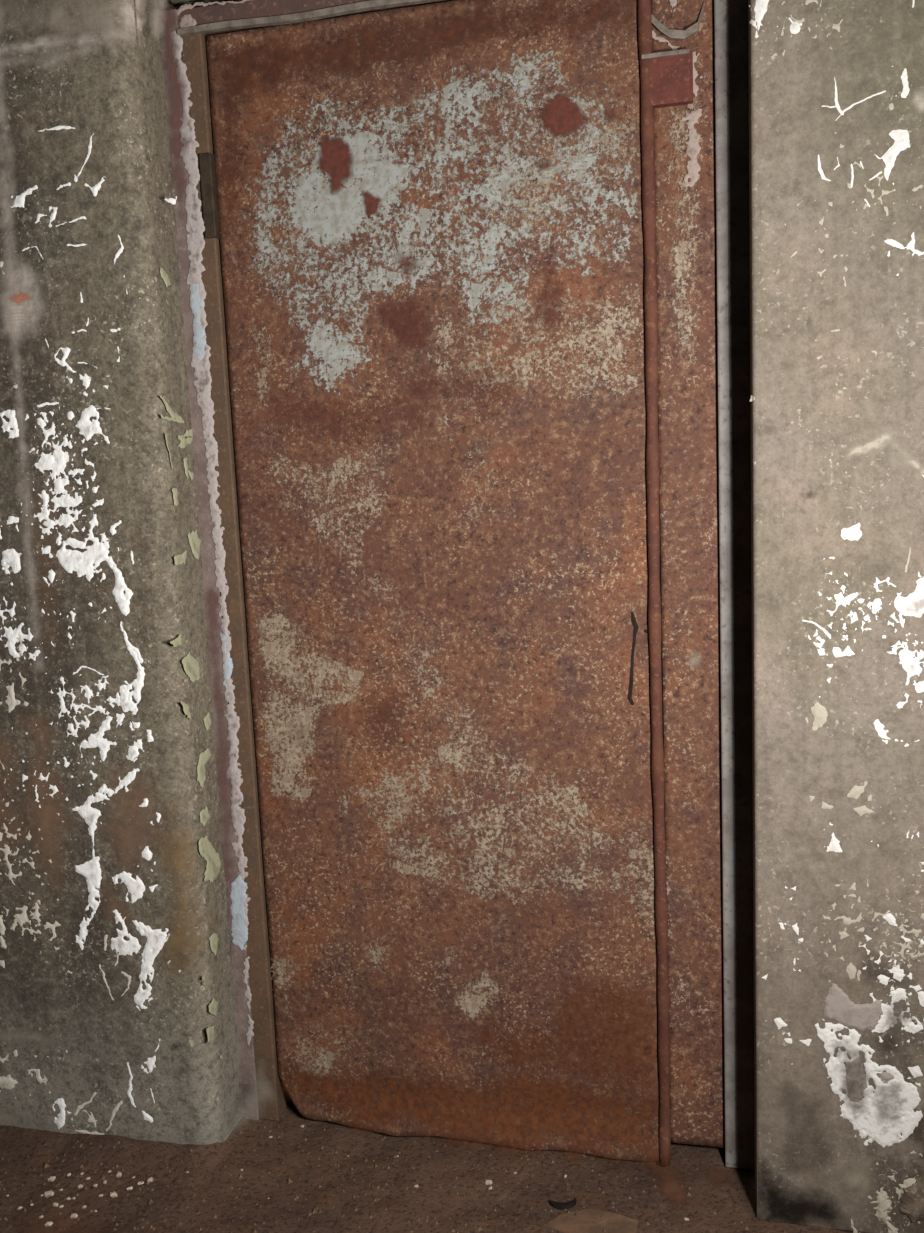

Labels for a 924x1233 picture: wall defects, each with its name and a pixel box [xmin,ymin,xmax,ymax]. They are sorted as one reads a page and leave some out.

peeling [749,0,843,62]
rust [319,138,351,193]
rust [363,192,380,217]
rust [543,93,586,136]
peeling [847,129,923,224]
peeling [237,42,645,533]
peeling [160,0,254,1047]
peeling [0,318,181,1010]
peeling [255,608,367,803]
peeling [802,557,924,714]
peeling [0,1039,160,1135]
peeling [774,879,924,1157]